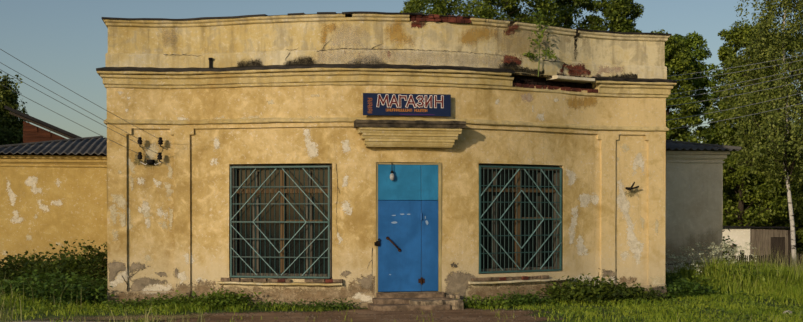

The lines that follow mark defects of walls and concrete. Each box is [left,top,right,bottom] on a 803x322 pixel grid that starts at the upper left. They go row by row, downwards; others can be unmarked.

flaking render [409,14,471,28]
flaking render [502,54,624,121]
peeling [303,128,319,158]
peeling [5,177,24,224]
peeling [25,176,63,219]
peeling [568,192,599,256]
peeling [616,179,644,264]
flaking render [107,252,375,305]
flaking render [444,262,638,303]
peeling [650,276,667,298]